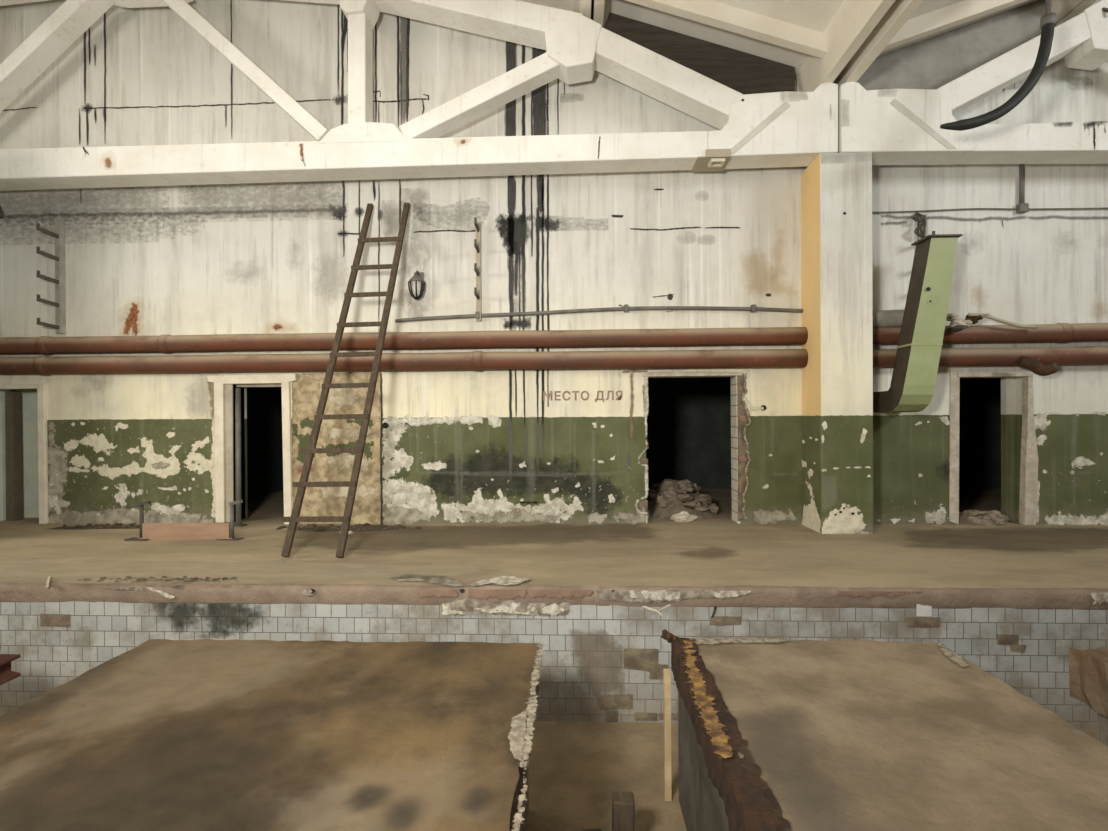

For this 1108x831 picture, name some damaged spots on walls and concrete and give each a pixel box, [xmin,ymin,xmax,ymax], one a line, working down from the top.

leakage [506,41,545,72]
leakage [505,78,565,136]
corrosion [124,303,139,335]
leakage [496,174,559,330]
flaking render [47,378,215,524]
flaking render [292,371,649,524]
spalling [737,373,948,534]
peeling [1036,470,1108,525]
leakage [153,602,259,637]
spalling [508,644,544,831]
peeling [624,648,668,679]
corrosion [671,637,791,831]